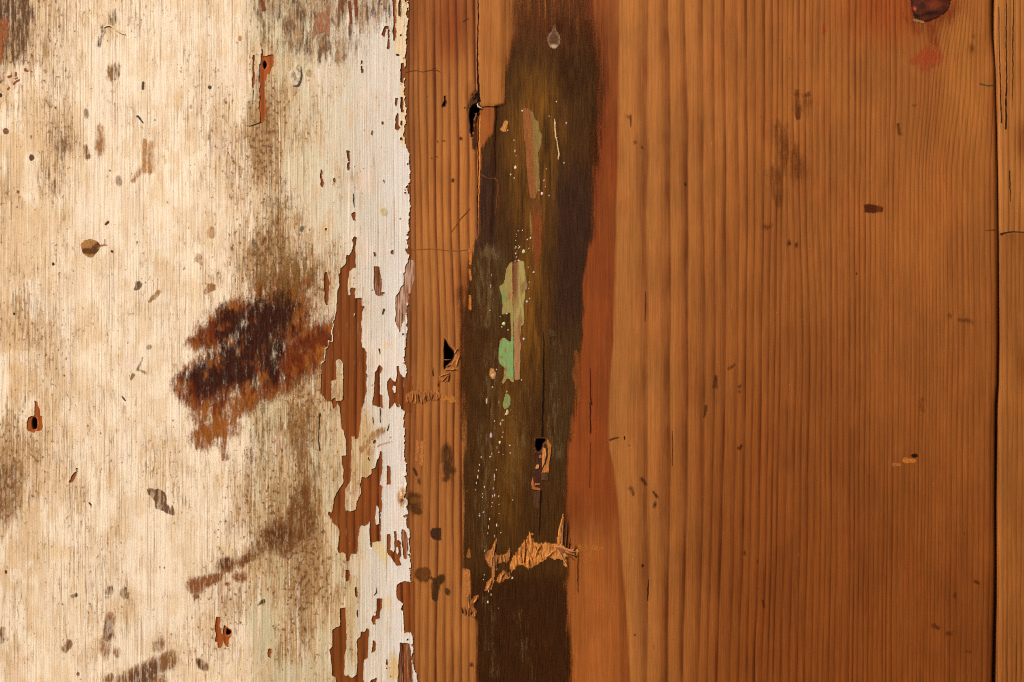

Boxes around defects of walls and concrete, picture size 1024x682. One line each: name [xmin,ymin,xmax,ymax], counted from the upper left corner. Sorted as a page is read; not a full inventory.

water stain [441,0,604,682]
peeling [321,236,460,598]
spalling [460,514,579,617]
peeling [330,598,382,682]
peeling [386,580,414,682]